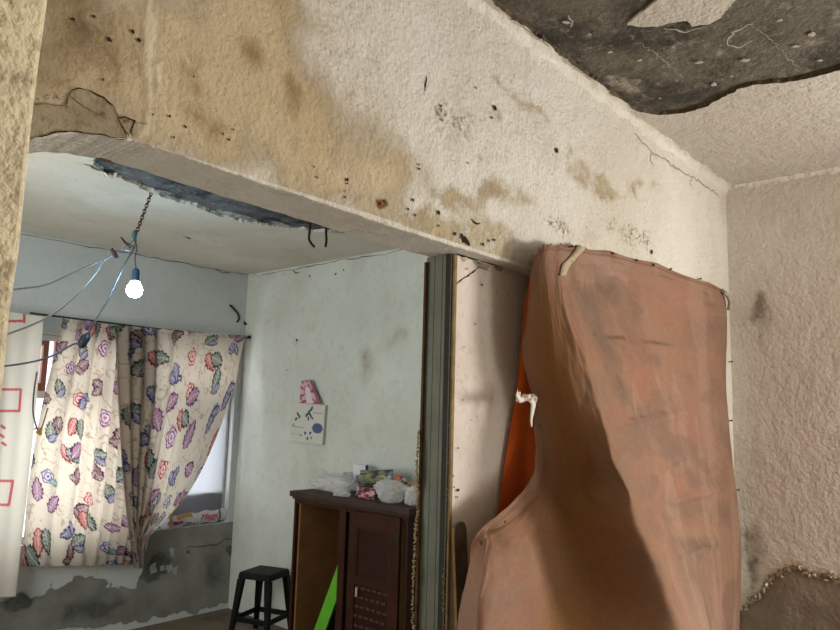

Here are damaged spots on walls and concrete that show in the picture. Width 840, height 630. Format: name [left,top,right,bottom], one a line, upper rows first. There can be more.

flaking render [492,0,840,115]
water stain [34,0,412,220]
flaking render [84,158,343,233]
water stain [442,182,507,209]
crack [634,133,719,197]
water stain [406,210,513,260]
peeling [0,522,233,630]